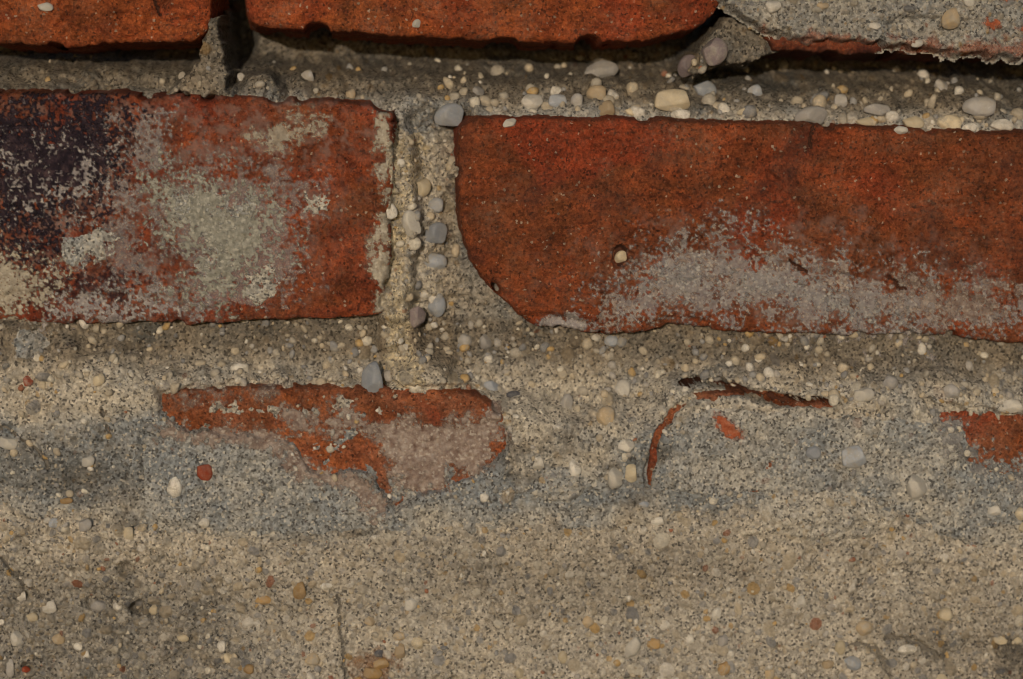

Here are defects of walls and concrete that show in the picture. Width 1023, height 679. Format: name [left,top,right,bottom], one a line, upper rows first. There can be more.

crack [153,0,162,16]
crack [788,259,808,273]
crack [888,275,907,290]
crack [678,376,828,404]
peeling [279,393,381,443]